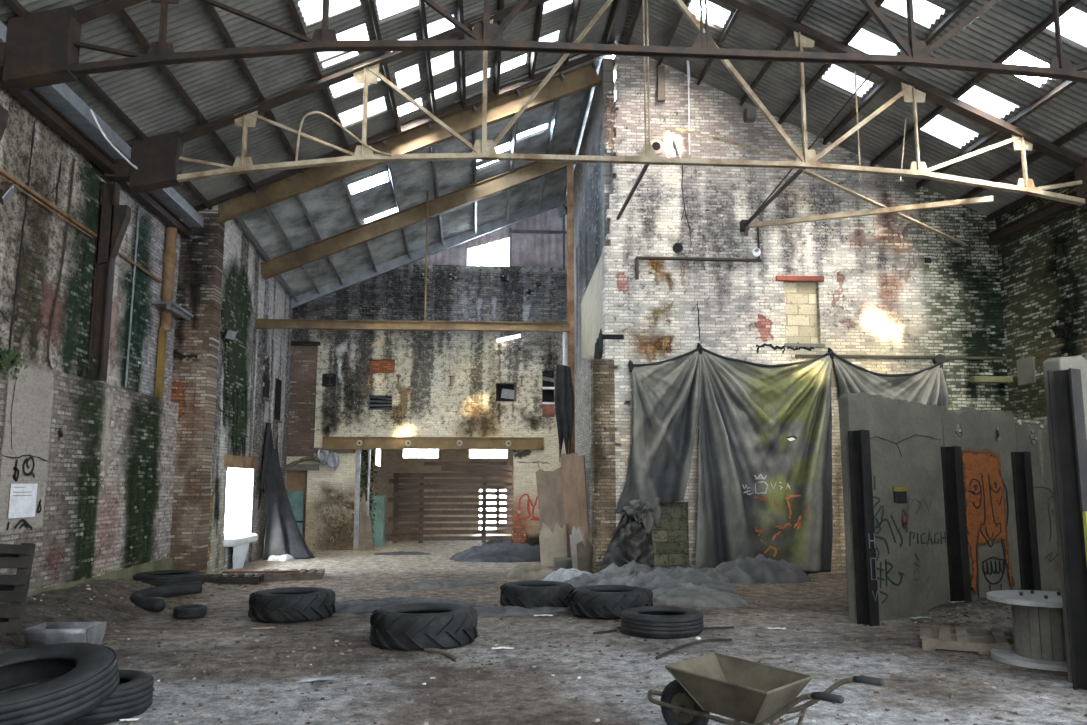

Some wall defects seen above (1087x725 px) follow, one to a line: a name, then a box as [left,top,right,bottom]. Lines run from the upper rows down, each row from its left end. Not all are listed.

damp [5,181,50,358]
rust [648,260,684,290]
damp [54,251,93,377]
damp [459,291,497,321]
damp [522,304,531,321]
rust [634,306,672,361]
peeling [754,315,775,341]
damp [322,342,361,437]
damp [461,394,548,437]